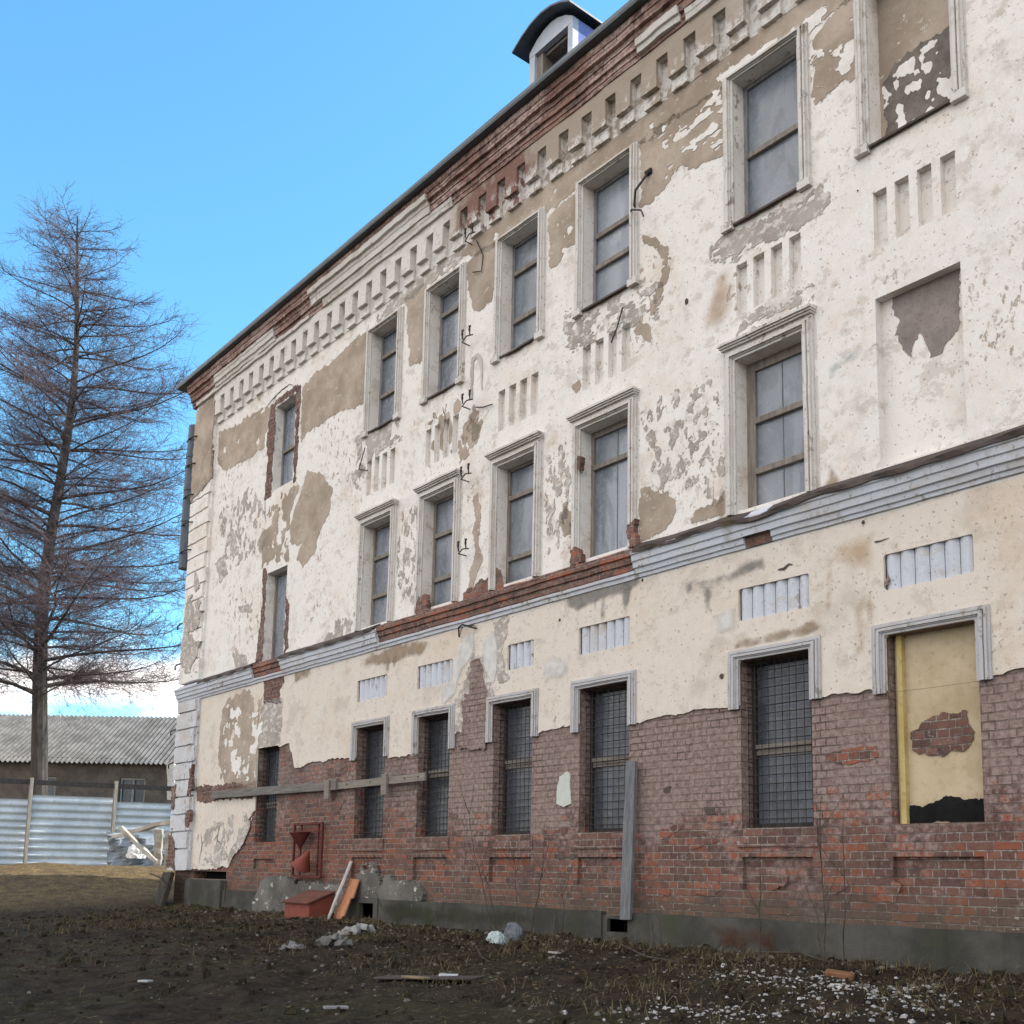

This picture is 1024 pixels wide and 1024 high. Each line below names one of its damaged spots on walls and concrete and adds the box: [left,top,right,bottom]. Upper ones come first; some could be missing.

peeling [882,26,952,136]
peeling [460,0,855,311]
peeling [892,268,961,363]
peeling [190,331,367,669]
peeling [626,379,726,548]
peeling [166,676,284,870]
flaking render [454,615,510,751]
peeling [556,772,572,807]
spalling [827,745,879,765]
spalling [910,710,975,757]
spalling [909,795,985,824]